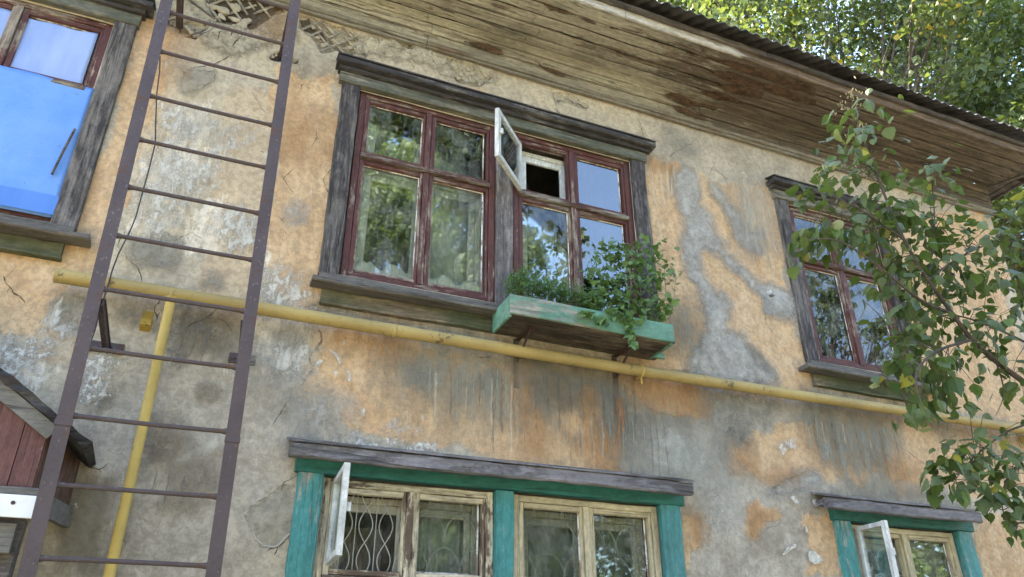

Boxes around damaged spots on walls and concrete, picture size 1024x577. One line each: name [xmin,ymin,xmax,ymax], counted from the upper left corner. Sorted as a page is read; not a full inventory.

spalling [167,0,497,87]
peeling [673,166,795,407]
crack [273,329,323,437]
water stain [403,349,507,432]
peeling [808,550,824,565]